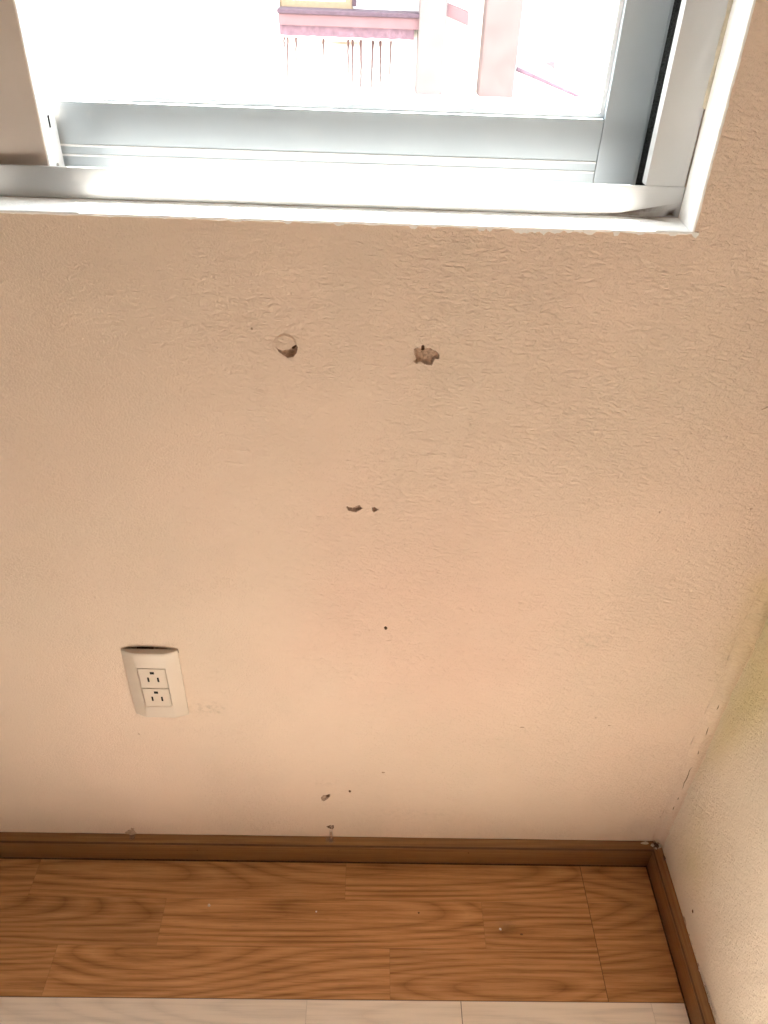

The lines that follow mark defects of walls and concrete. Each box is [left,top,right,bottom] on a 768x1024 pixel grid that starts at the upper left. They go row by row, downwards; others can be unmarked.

spalling [272,333,298,358]
spalling [413,344,440,366]
spalling [346,505,380,513]